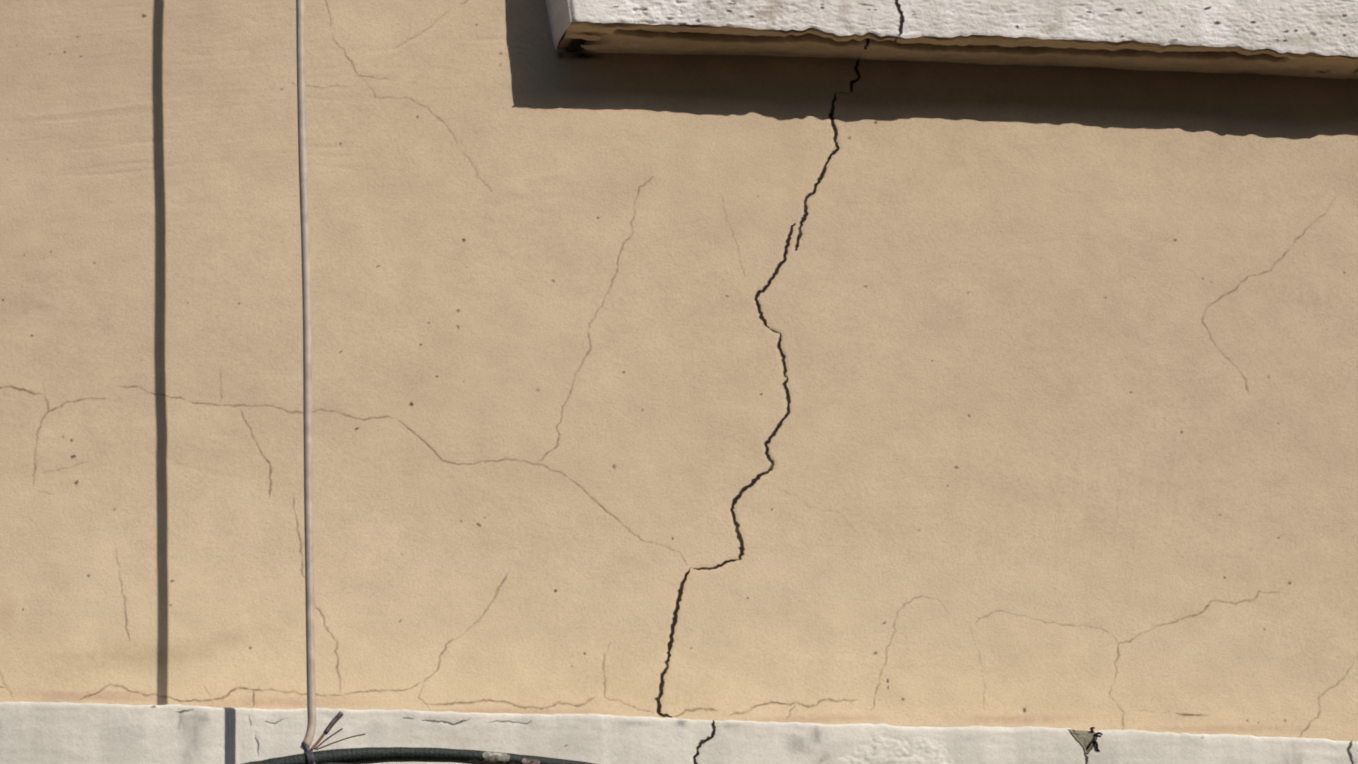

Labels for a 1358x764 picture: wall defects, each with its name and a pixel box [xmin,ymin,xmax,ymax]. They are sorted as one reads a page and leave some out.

crack [655,0,905,718]
crack [423,700,490,725]
crack [693,720,716,764]
crack [1346,741,1354,764]